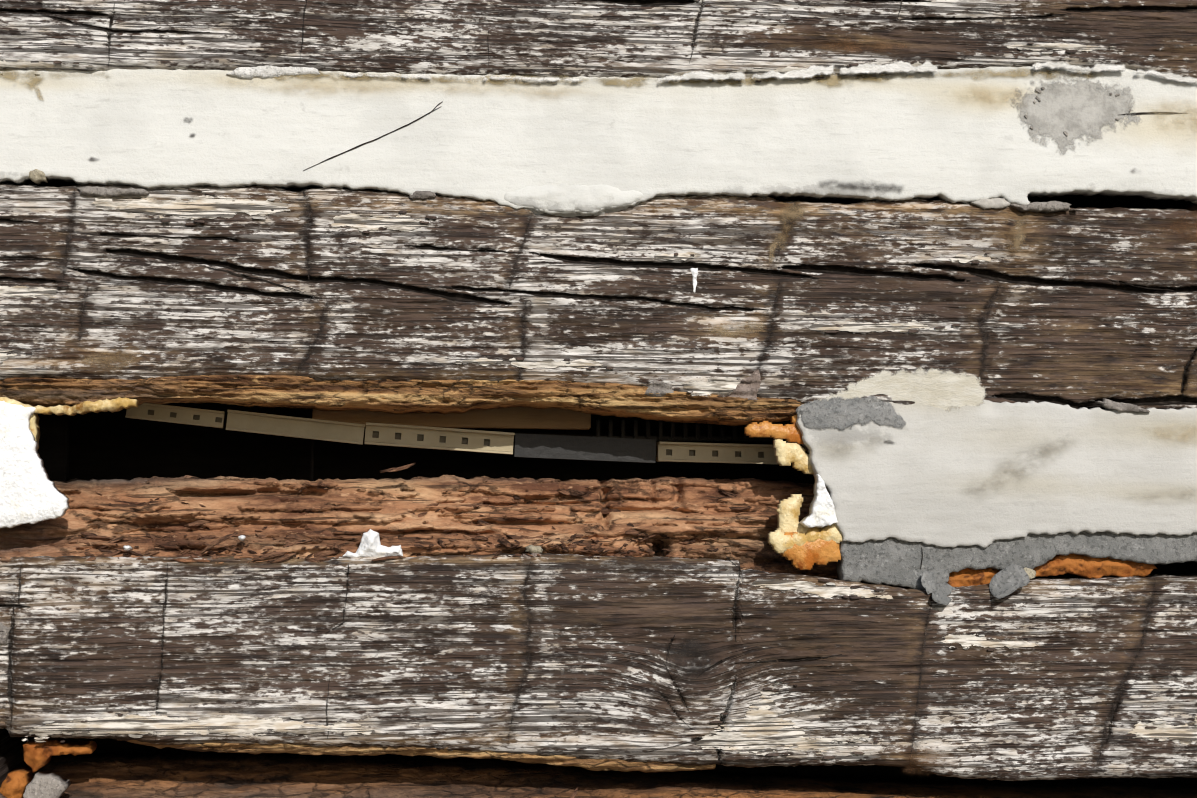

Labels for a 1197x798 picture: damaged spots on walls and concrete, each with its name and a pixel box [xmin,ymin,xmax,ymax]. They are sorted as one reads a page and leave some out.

crack [0,0,208,66]
crack [299,0,307,59]
crack [586,0,703,63]
crack [845,0,1197,20]
spalling [1012,74,1140,154]
crack [0,101,1197,410]
spalling [752,531,1197,605]